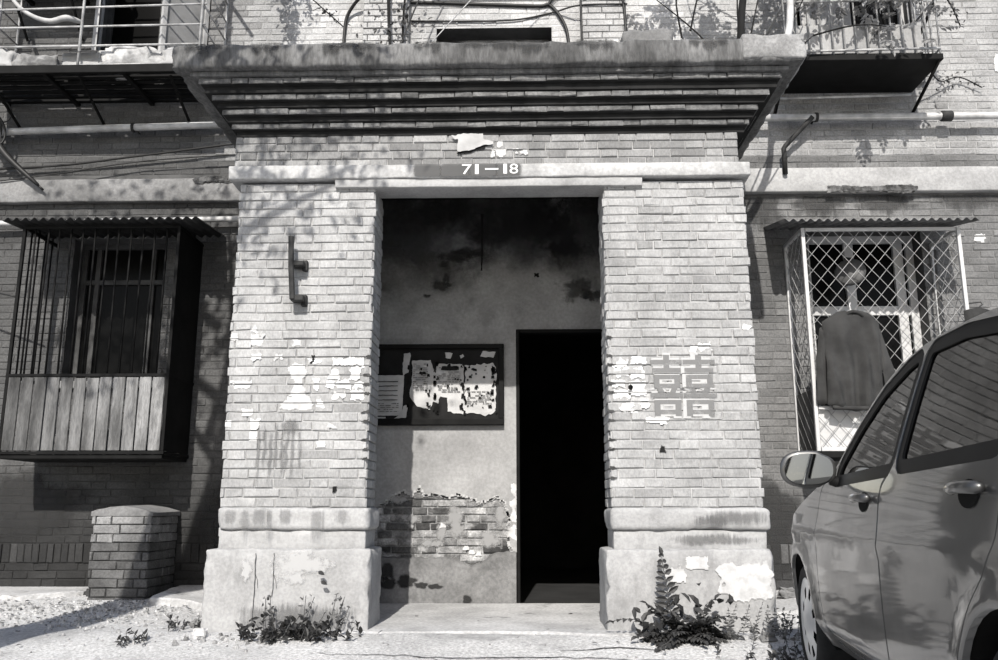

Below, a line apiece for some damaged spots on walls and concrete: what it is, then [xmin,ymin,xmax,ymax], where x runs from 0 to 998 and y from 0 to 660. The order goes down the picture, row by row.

peeling [491,140,528,157]
peeling [250,325,265,362]
peeling [689,342,713,353]
peeling [230,380,252,389]
peeling [273,354,371,423]
peeling [606,354,670,425]
peeling [241,408,261,441]
flaking render [374,479,517,570]
peeling [664,556,774,602]